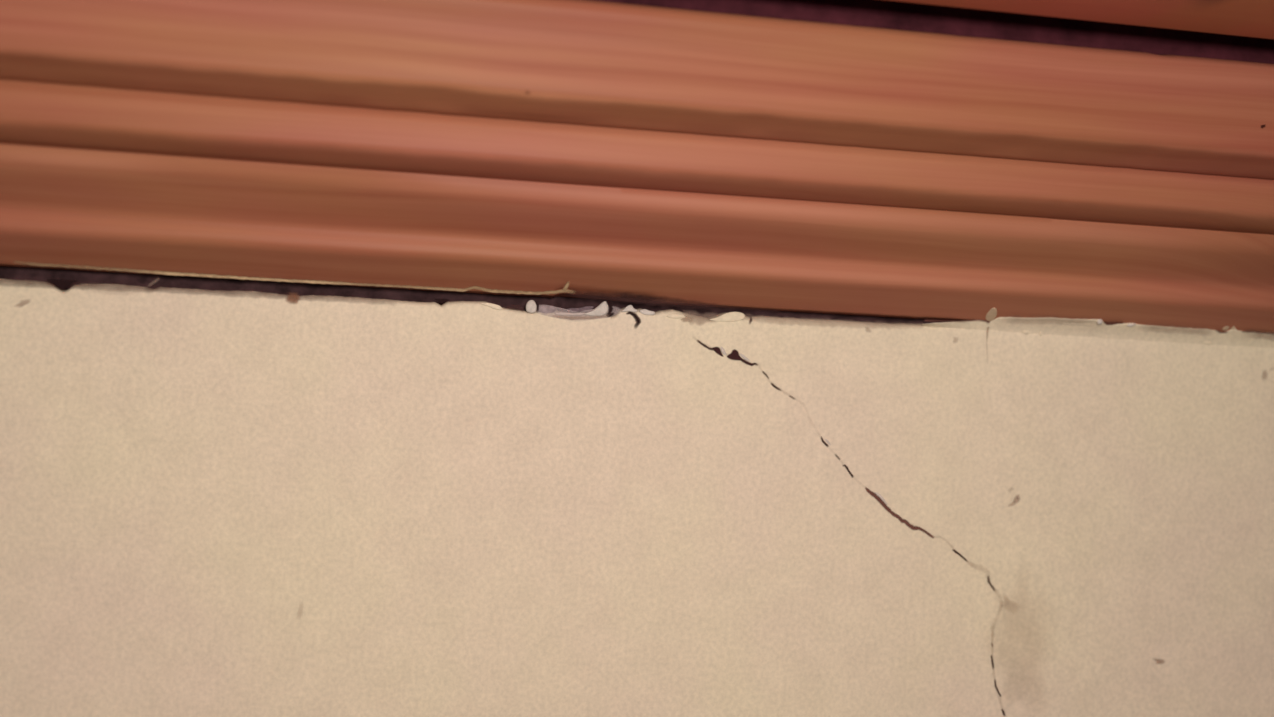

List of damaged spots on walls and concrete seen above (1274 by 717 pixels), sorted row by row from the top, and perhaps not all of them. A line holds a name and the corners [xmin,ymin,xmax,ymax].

flaking render [480,300,686,327]
flaking render [709,312,745,322]
crack [698,341,780,390]
crack [821,438,994,589]
crack [991,656,1005,715]